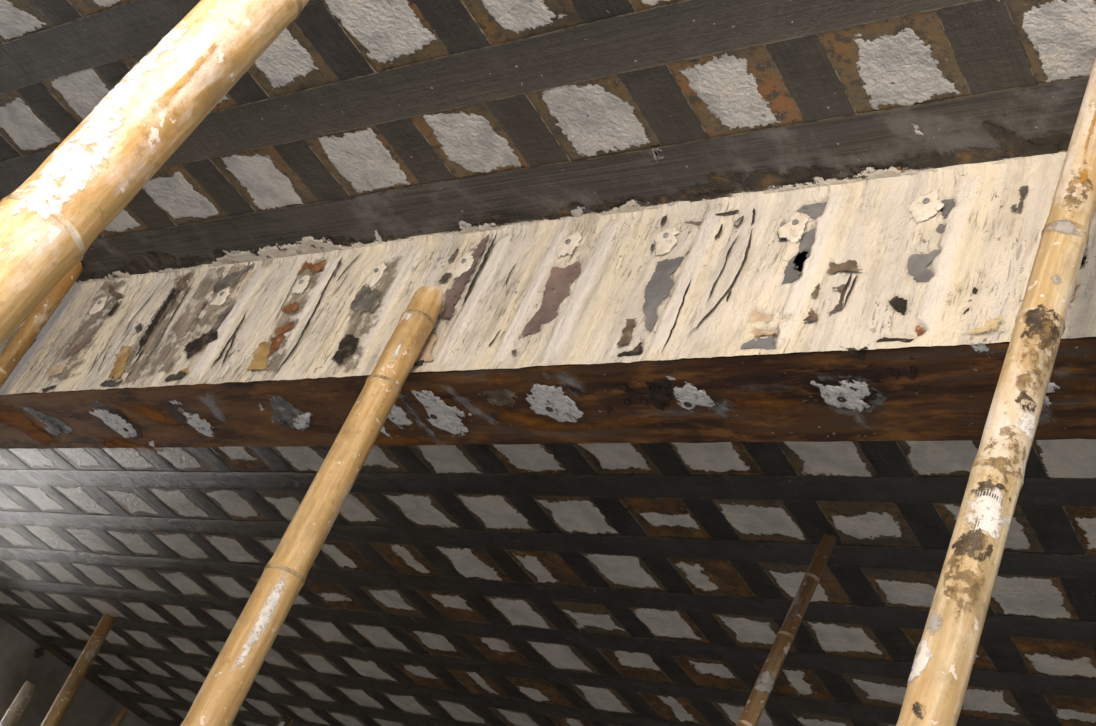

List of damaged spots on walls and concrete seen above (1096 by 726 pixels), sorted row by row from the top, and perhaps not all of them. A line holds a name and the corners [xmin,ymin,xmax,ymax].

peeling [42,280,125,392]
peeling [100,263,254,387]
peeling [247,257,342,372]
peeling [331,256,398,373]
peeling [413,234,490,367]
peeling [521,260,581,337]
peeling [617,244,689,357]
peeling [781,202,827,285]
peeling [888,296,908,315]
peeling [876,325,924,343]
peeling [907,249,941,282]
peeling [936,199,955,234]